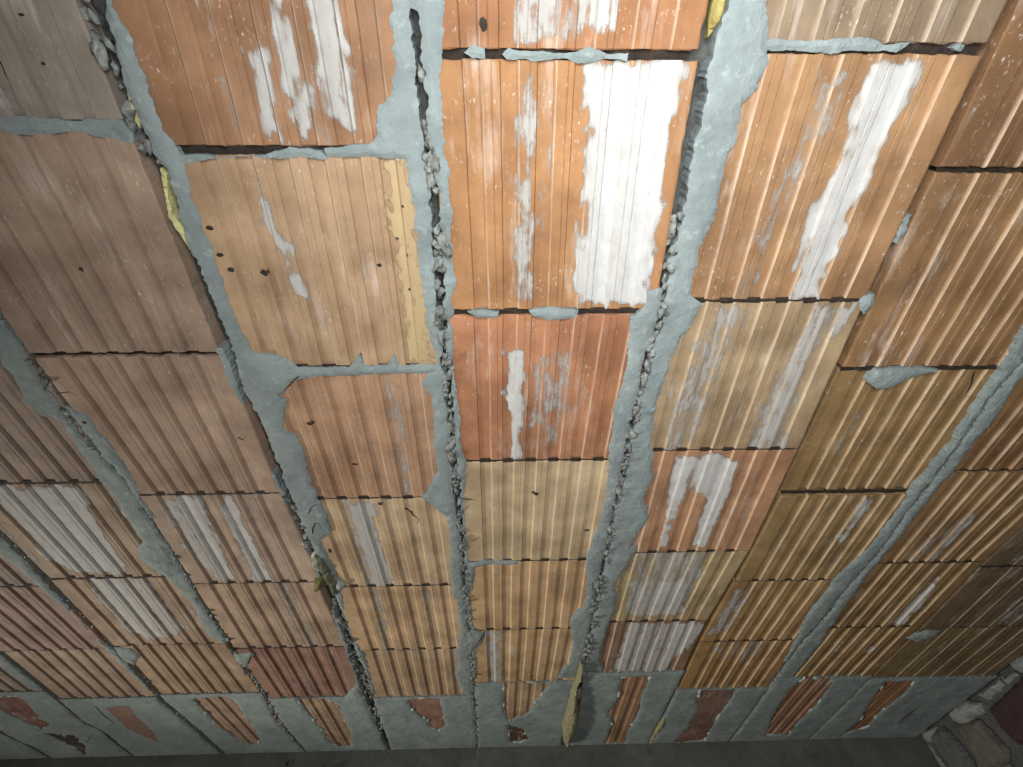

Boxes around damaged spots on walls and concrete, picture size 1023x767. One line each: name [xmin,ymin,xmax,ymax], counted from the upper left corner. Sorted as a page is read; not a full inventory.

leakage [240,0,357,144]
crack [767,42,979,56]
efflorescence [572,60,690,309]
leakage [749,57,926,449]
crack [694,296,860,304]
crack [0,0,794,745]
crack [923,364,1015,428]
efflorescence [0,484,205,641]
spalling [194,696,260,745]
spalling [297,698,351,748]
spalling [604,676,652,744]
spalling [765,676,833,736]